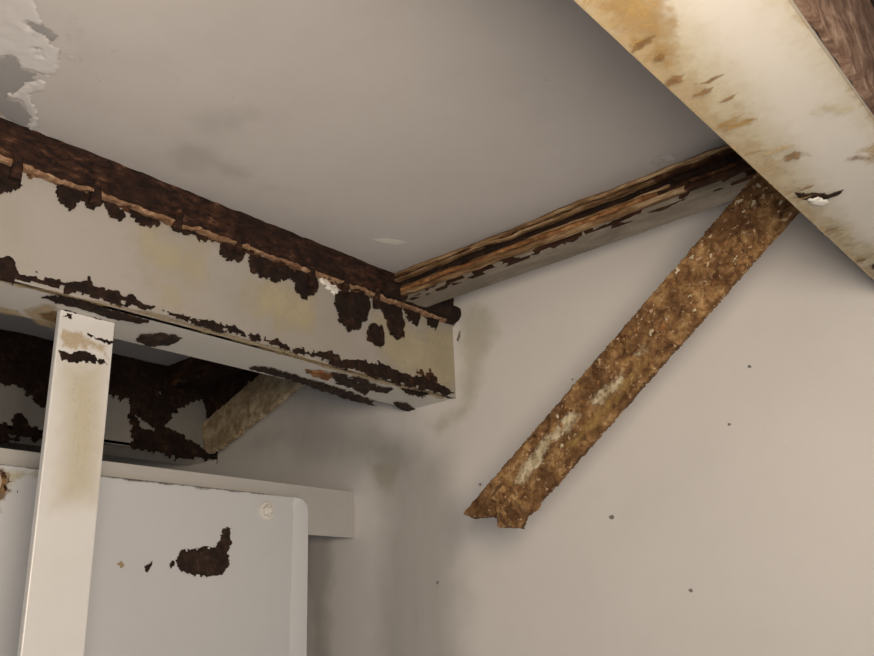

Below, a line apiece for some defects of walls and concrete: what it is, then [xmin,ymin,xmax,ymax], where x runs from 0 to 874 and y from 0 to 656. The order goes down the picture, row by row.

peeling [0,0,62,139]
peeling [794,190,843,206]
corrosion [0,470,18,500]
corrosion [0,329,218,462]
peeling [135,399,208,450]
corrosion [0,256,454,412]